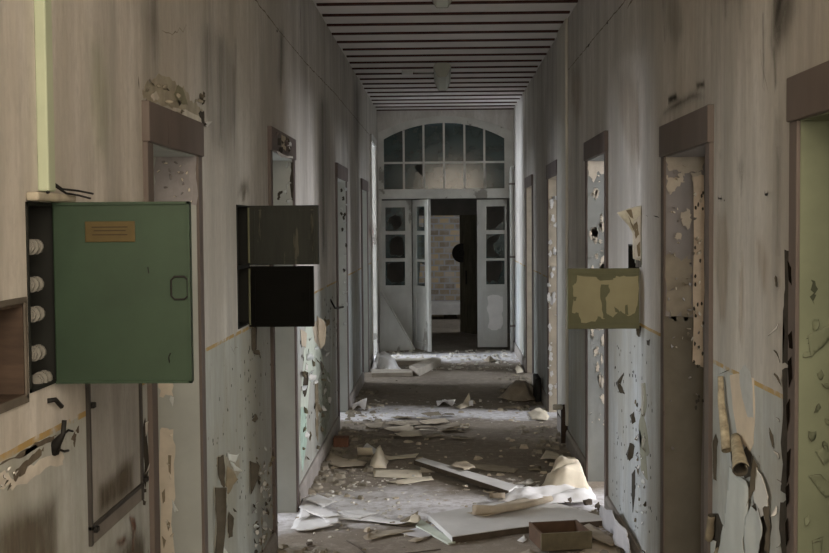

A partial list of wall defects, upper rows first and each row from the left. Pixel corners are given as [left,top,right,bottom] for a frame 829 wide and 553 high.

spalling [142,73,212,127]
peeling [588,161,604,200]
peeling [589,214,604,268]
peeling [617,206,642,267]
peeling [665,157,705,368]
peeling [299,297,346,472]
peeling [590,329,604,425]
peeling [614,362,634,394]
peeling [705,250,789,553]
peeling [0,435,64,490]
peeling [213,437,278,553]
peeling [617,383,657,528]